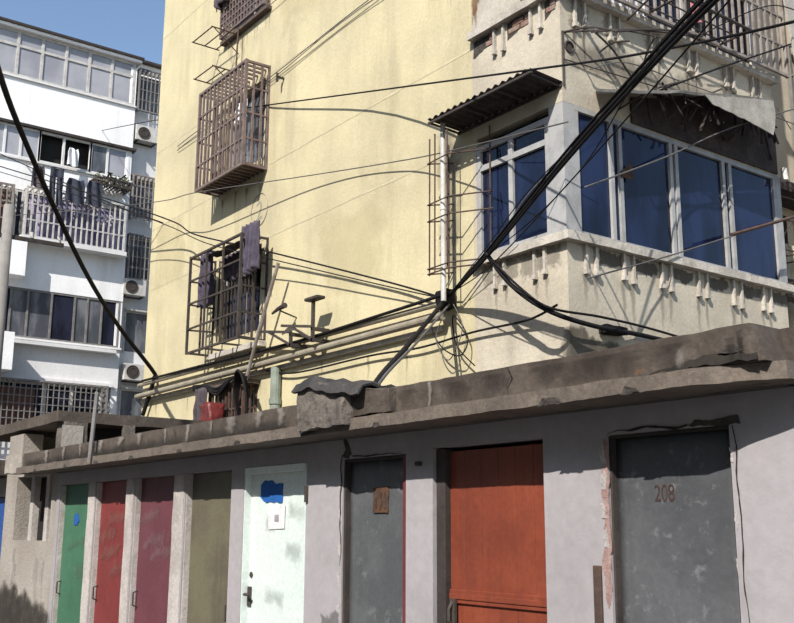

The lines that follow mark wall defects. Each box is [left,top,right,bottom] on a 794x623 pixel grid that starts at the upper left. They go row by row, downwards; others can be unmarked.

flaking render [472,0,520,30]
spalling [507,12,529,41]
spalling [544,0,556,20]
spalling [473,33,492,59]
leakage [599,249,622,267]
leakage [635,259,658,277]
leakage [673,268,693,285]
leakage [709,277,729,291]
leakage [743,284,761,299]
spalling [649,330,758,375]
peeling [597,415,750,623]
leakage [0,585,47,623]